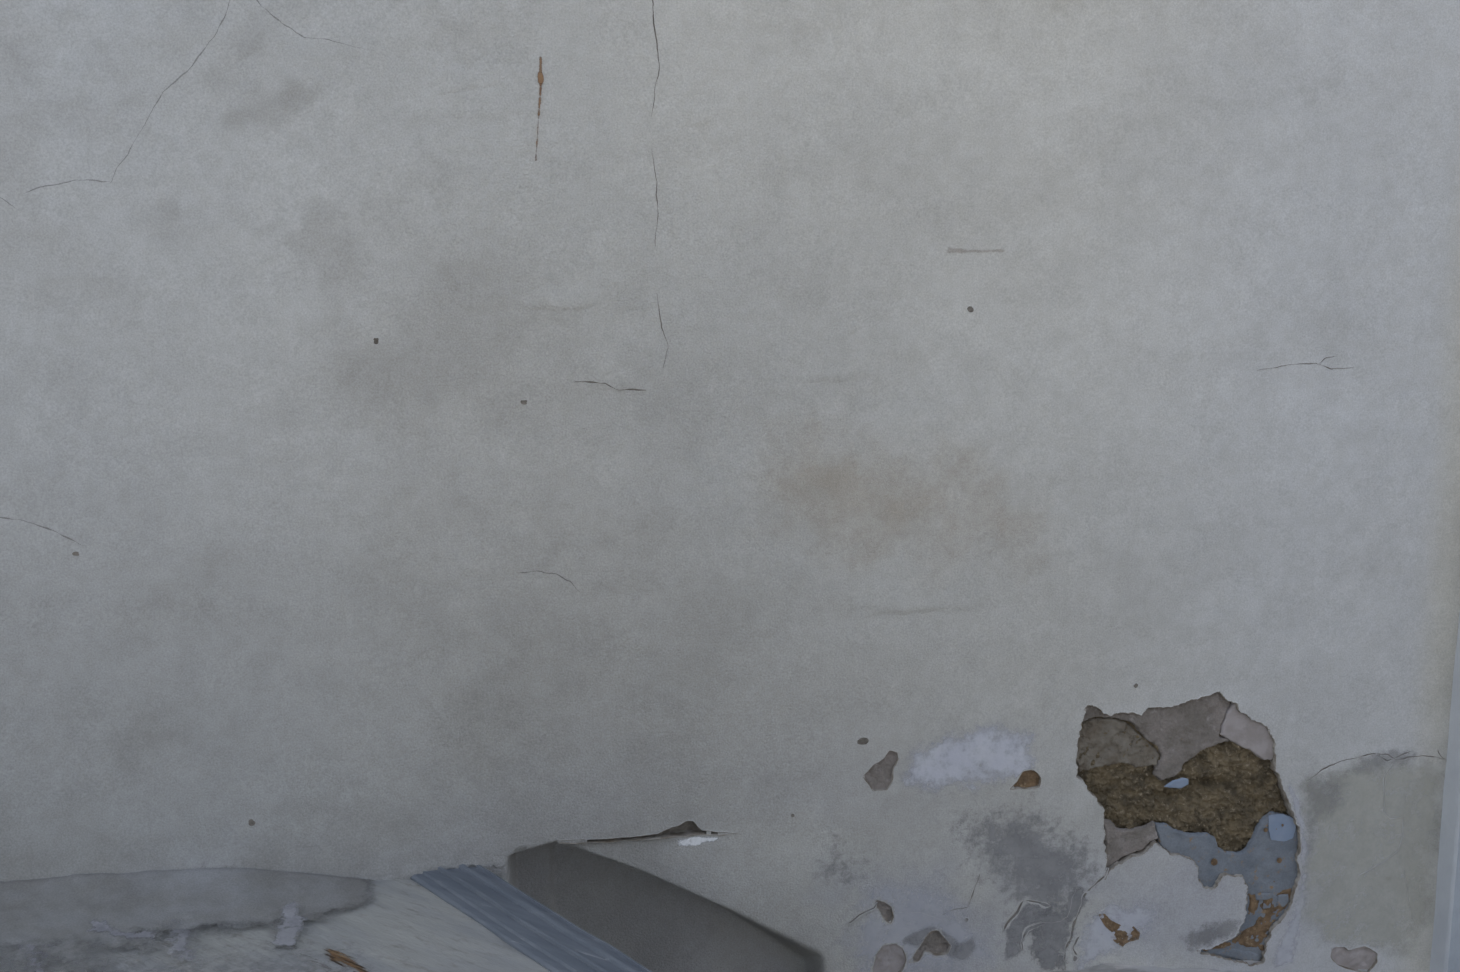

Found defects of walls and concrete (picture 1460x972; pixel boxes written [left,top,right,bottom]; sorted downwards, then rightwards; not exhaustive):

corrosion [535,57,544,161]
crack [650,0,660,247]
spalling [854,735,872,746]
flaking render [863,750,899,791]
water stain [904,727,1034,789]
flaking render [1010,769,1042,790]
spalling [1075,691,1302,967]
flaking render [874,899,894,924]
flaking render [872,917,974,972]
flaking render [1006,889,1085,970]
water stain [962,816,1157,970]